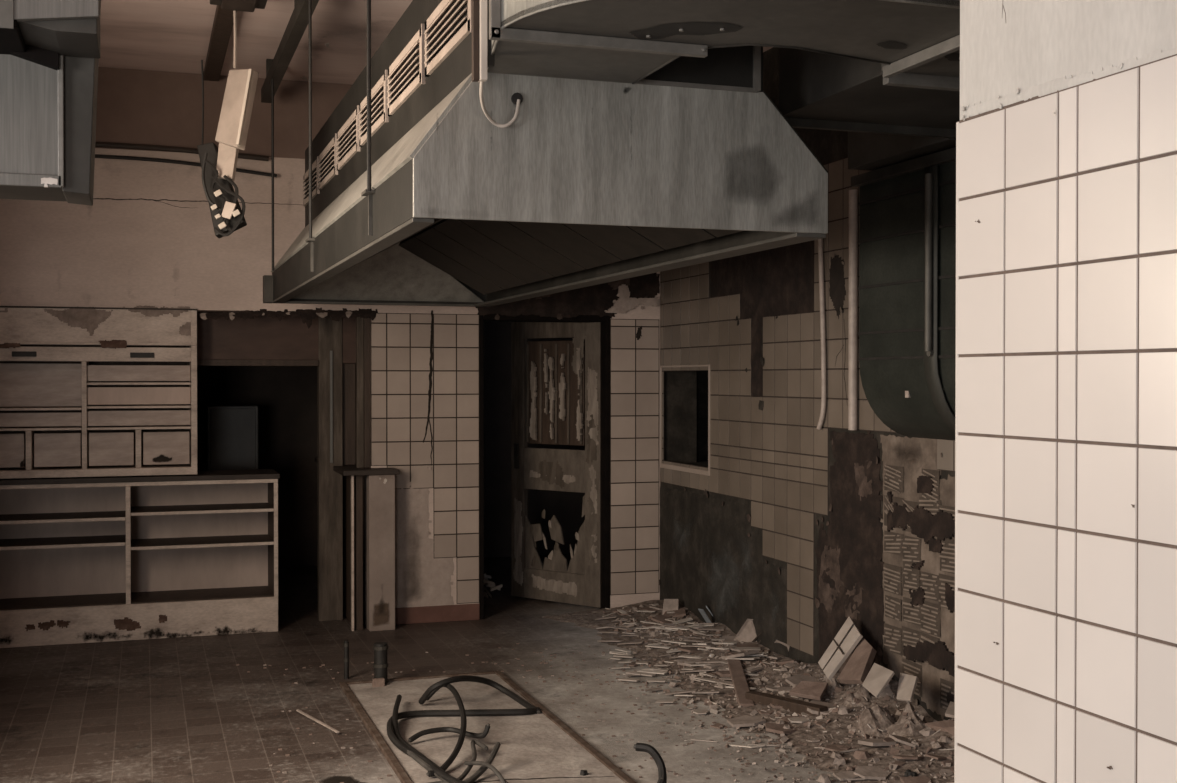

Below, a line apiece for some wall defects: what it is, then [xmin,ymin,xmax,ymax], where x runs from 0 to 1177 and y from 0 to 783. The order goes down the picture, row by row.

peeling [659,486,790,658]
spalling [815,431,942,681]